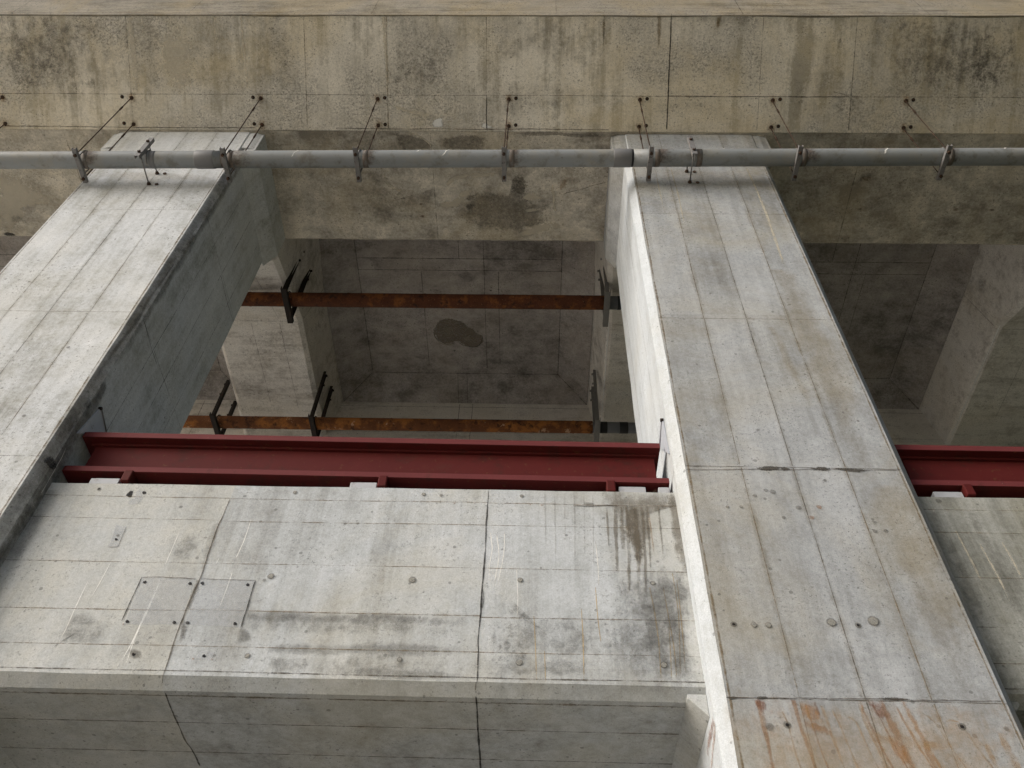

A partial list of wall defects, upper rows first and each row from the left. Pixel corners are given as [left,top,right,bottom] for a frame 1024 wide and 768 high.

crack [163,499,230,766]
crack [475,493,489,768]
leakage [571,500,675,585]